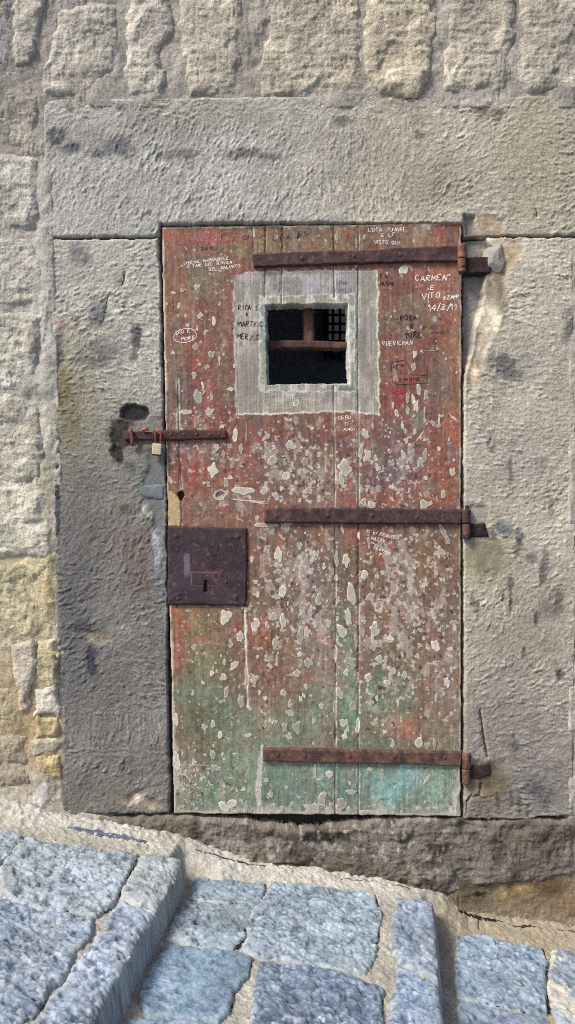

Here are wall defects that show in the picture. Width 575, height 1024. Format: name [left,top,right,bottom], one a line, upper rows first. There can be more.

peeling [179,389,214,416]
peeling [413,384,429,413]
peeling [337,429,371,489]
peeling [207,457,280,504]
peeling [334,551,351,568]
peeling [221,610,233,626]
peeling [228,612,286,650]
peeling [334,570,382,682]
peeling [333,687,360,734]
peeling [219,799,238,813]
peeling [303,790,357,815]
crack [459,910,574,932]